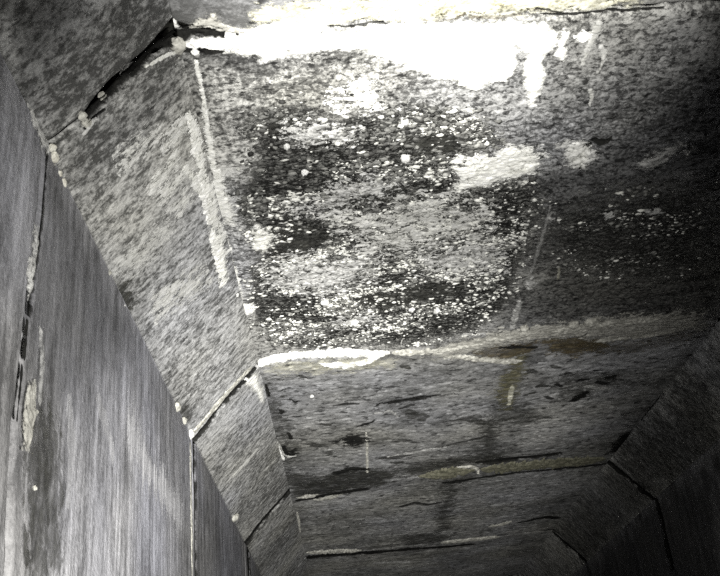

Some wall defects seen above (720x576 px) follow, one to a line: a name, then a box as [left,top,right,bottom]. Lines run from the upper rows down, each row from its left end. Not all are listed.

crack [83,25,239,136]
damp [323,73,388,117]
damp [223,0,643,107]
peeling [26,225,39,301]
damp [510,300,522,330]
peeling [22,379,39,451]
damp [285,432,397,502]